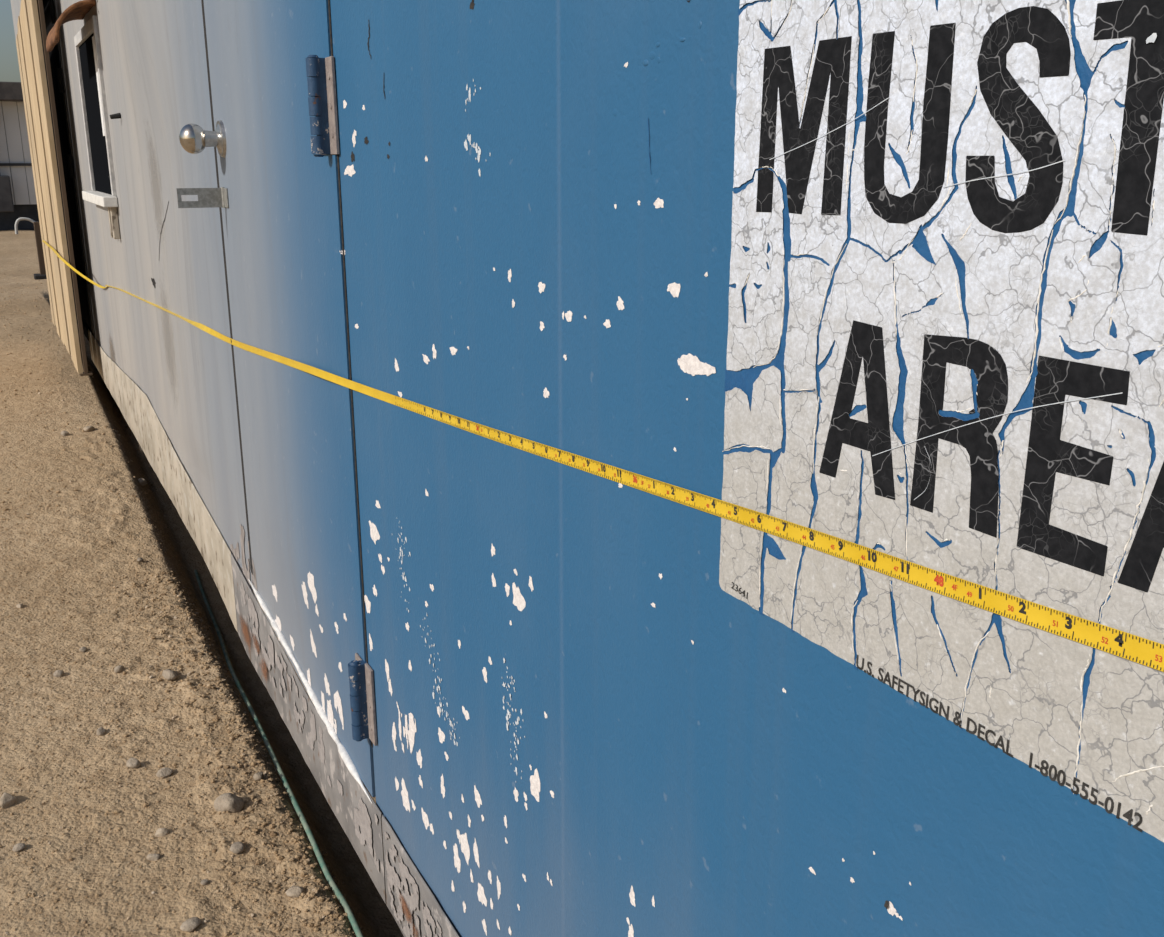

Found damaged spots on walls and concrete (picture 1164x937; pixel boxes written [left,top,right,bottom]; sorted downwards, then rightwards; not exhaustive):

peeling [667,282,681,298]
peeling [677,353,716,376]
crack [722,0,977,677]
crack [931,0,1163,731]
peeling [230,524,347,795]
peeling [364,520,390,614]
peeling [492,569,534,625]
crack [1071,399,1164,796]
peeling [385,659,511,936]
peeling [513,765,554,811]
peeling [354,798,441,937]
peeling [626,886,636,937]